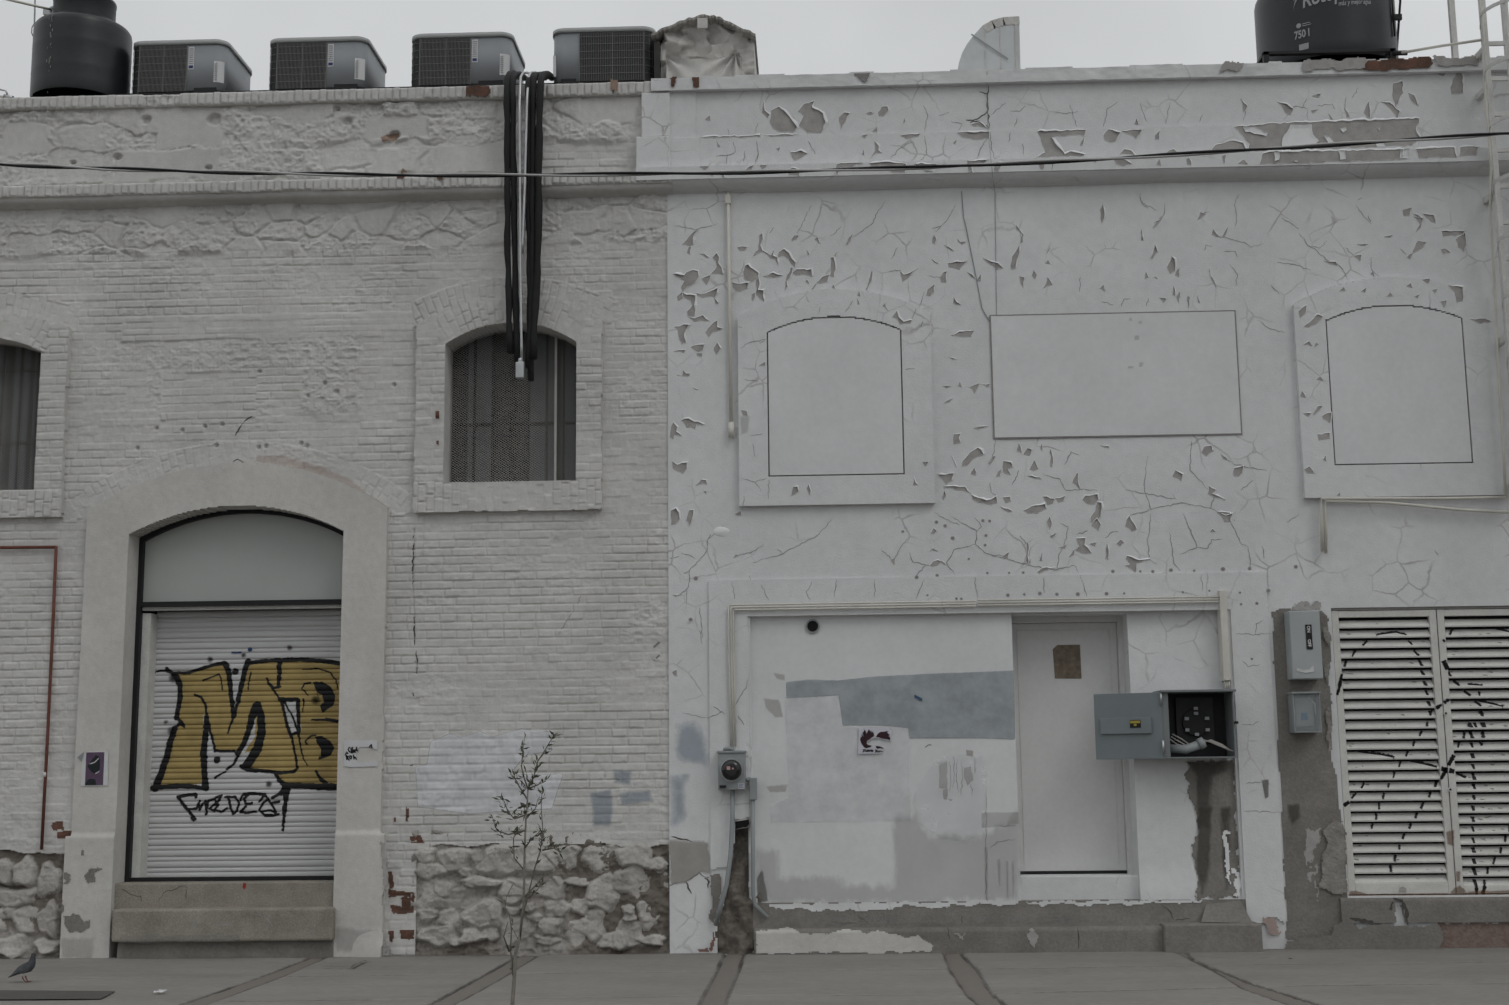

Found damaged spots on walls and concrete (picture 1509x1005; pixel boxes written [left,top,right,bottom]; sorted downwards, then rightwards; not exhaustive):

peeling [702,100,937,176]
peeling [953,121,991,144]
peeling [1035,118,1192,169]
peeling [673,229,853,389]
peeling [926,225,1053,305]
peeling [1140,195,1200,308]
peeling [669,417,705,440]
crack [669,433,829,644]
peeling [913,425,1150,574]
crack [874,440,1264,598]
peeling [1184,759,1241,900]
peeling [380,841,415,954]